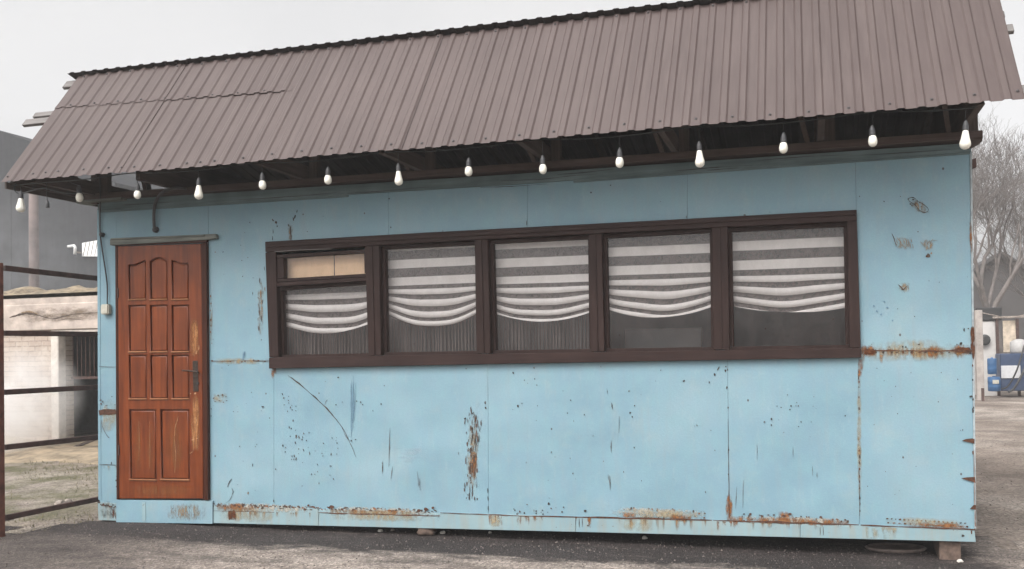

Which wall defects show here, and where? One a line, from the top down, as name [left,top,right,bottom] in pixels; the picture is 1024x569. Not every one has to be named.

rust [858,327,975,410]
rust [213,438,976,537]